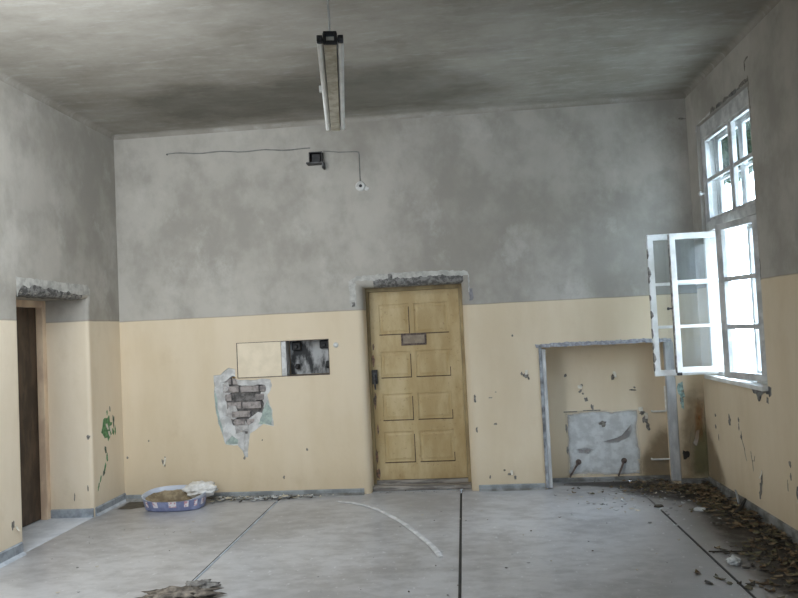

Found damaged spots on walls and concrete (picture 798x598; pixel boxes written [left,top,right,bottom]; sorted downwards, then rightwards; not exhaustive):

spalling [16,277,90,300]
spalling [348,270,474,307]
spalling [214,368,274,459]
flaking render [564,384,650,474]
spalling [752,386,771,404]